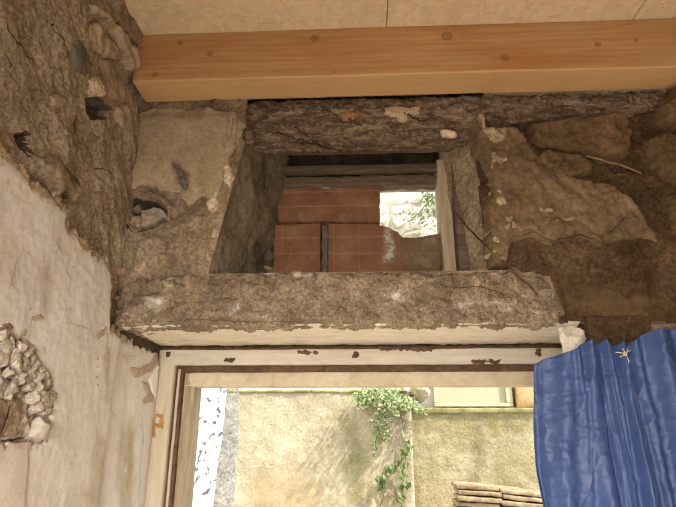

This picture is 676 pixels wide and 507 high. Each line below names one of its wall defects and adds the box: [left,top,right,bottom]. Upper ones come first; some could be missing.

spalling [132,197,167,216]
peeling [0,139,133,344]
damp [385,233,394,260]
crack [518,217,633,247]
crack [431,280,523,305]
peeling [377,345,436,353]
spalling [0,323,57,445]
peeling [130,353,159,405]
rust [152,413,164,437]